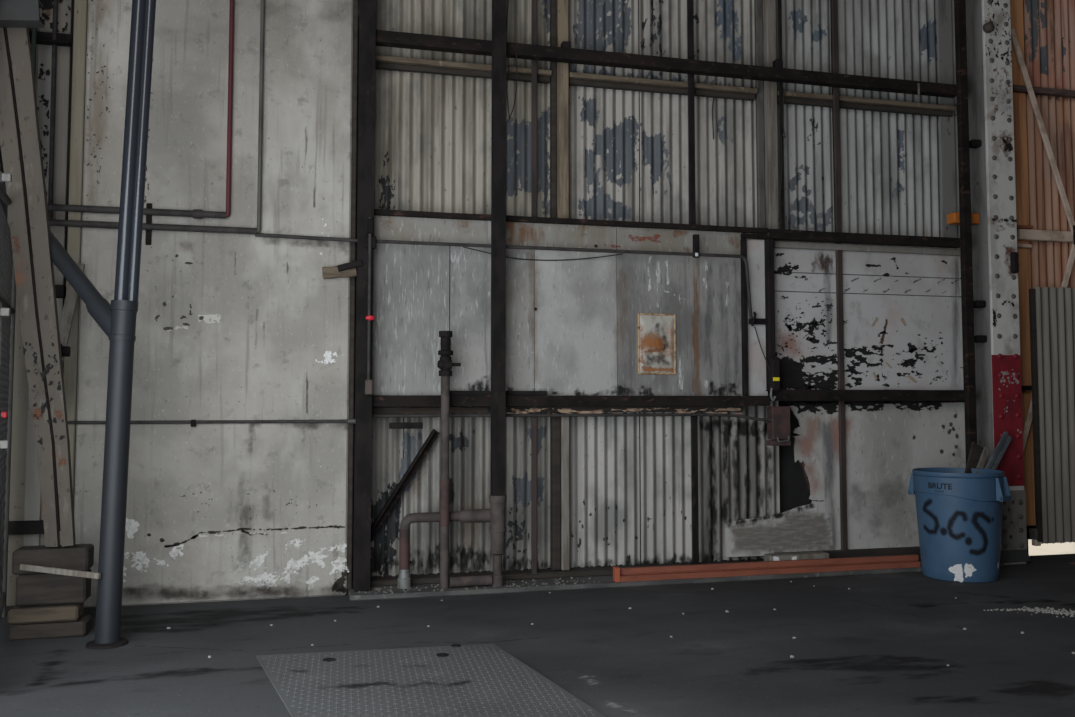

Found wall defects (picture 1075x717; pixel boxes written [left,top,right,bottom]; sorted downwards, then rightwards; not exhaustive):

peeling [572,0,665,57]
peeling [715,0,742,61]
peeling [985,0,1012,62]
peeling [1025,0,1048,75]
peeling [506,106,550,216]
peeling [578,96,671,221]
peeling [774,253,806,278]
peeling [775,296,947,415]
peeling [126,518,140,539]
peeling [123,543,184,582]
crack [147,525,345,548]
peeling [235,538,349,593]